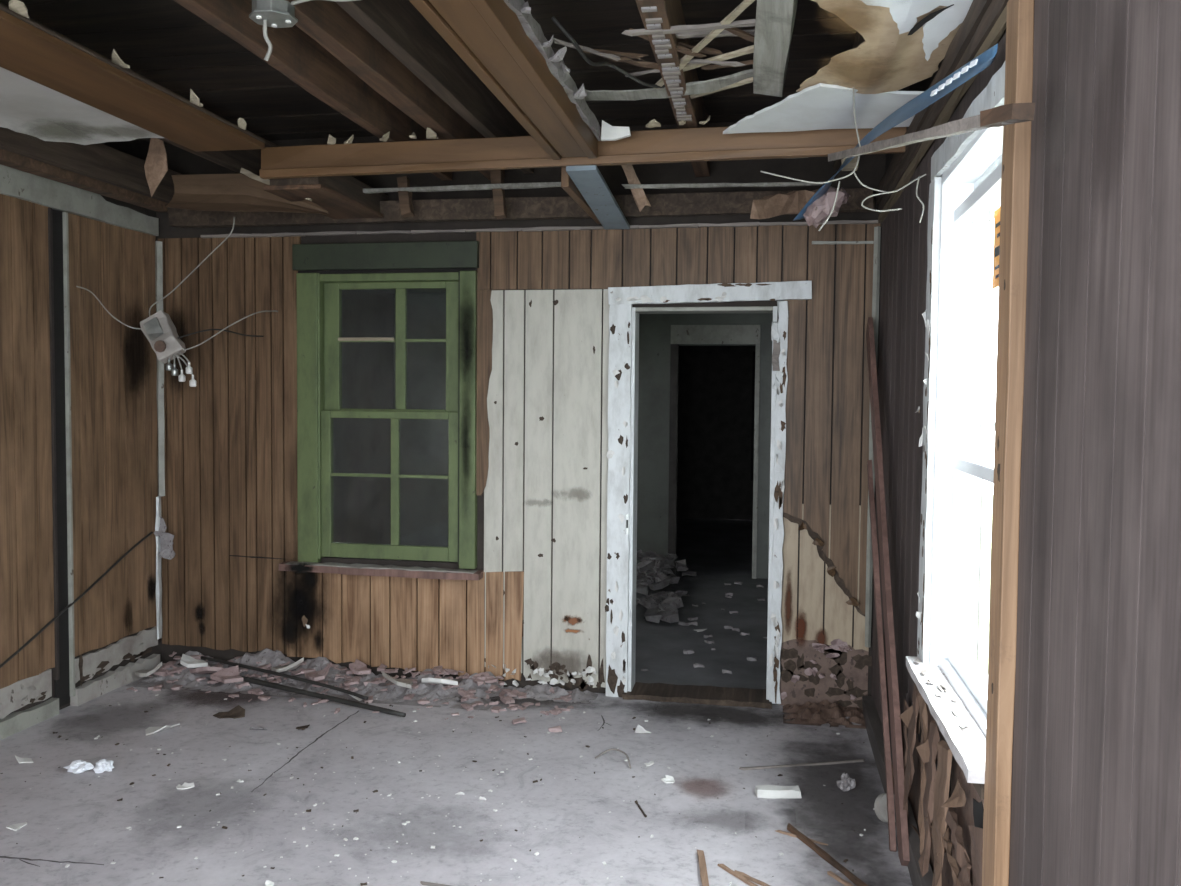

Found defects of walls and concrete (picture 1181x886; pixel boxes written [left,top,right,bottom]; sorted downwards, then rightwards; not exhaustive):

peeling [612,363,630,388]
peeling [777,331,786,407]
peeling [607,421,628,459]
peeling [774,481,784,531]
leakage [280,563,323,649]
spalling [769,613,872,710]